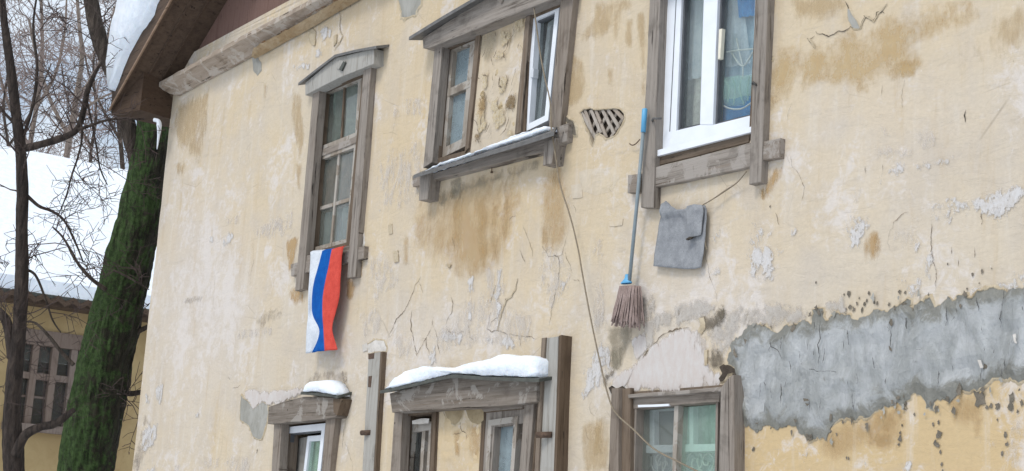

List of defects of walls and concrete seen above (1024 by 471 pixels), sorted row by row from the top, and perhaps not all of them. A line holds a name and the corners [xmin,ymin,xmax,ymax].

crack [807,3,887,48]
peeling [932,185,1024,224]
crack [391,217,572,356]
spalling [581,239,1024,471]
spalling [239,388,303,453]